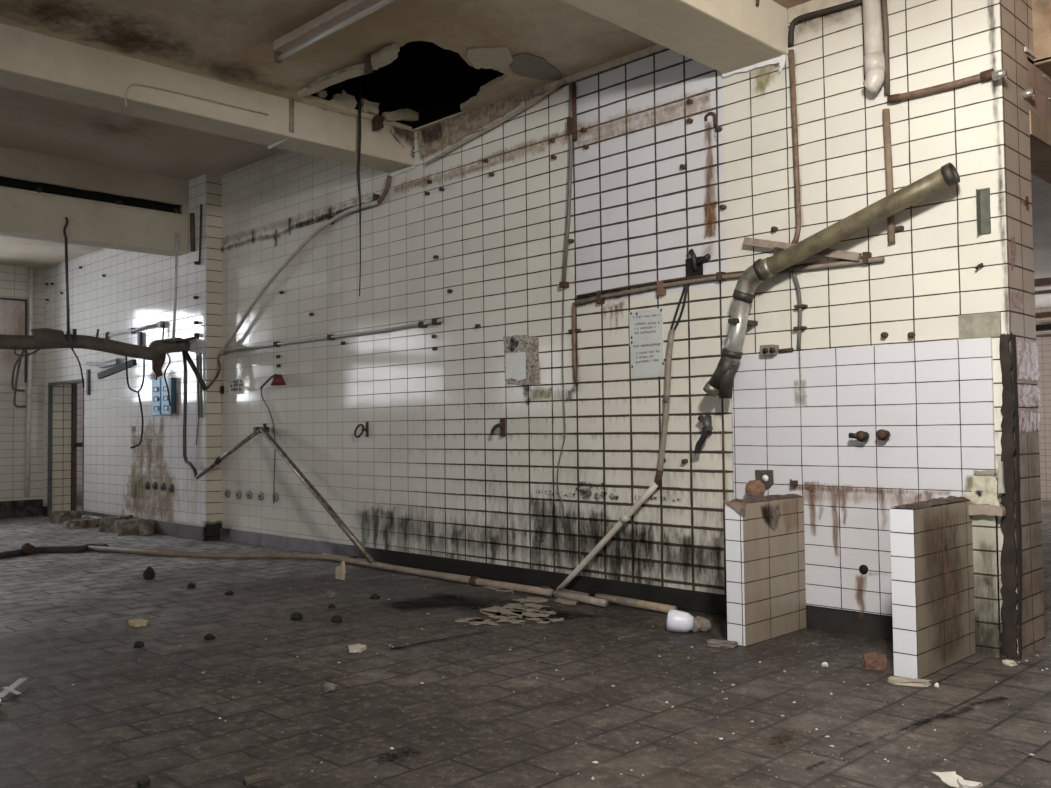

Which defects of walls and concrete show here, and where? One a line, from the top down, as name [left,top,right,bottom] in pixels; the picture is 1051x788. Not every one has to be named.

flaking render [297,43,419,131]
flaking render [467,46,562,80]
rust [704,112,717,236]
peeling [503,335,540,385]
spalling [962,293,1023,660]
leakage [362,513,408,550]
leakage [535,504,651,578]
rust [798,482,901,553]